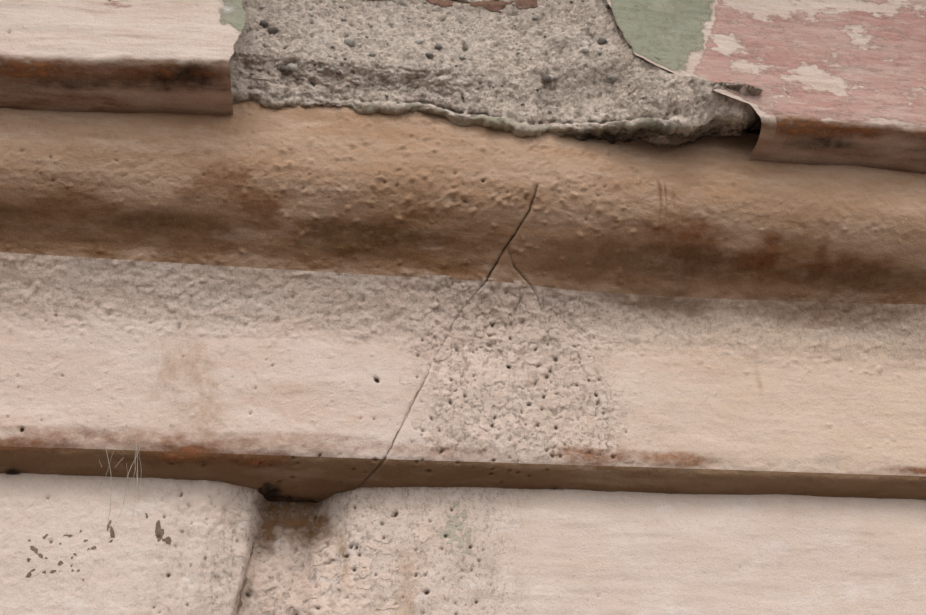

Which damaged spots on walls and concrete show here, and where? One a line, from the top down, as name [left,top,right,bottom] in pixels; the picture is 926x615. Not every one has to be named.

spalling [220,0,926,147]
crack [484,190,542,311]
crack [358,311,462,487]